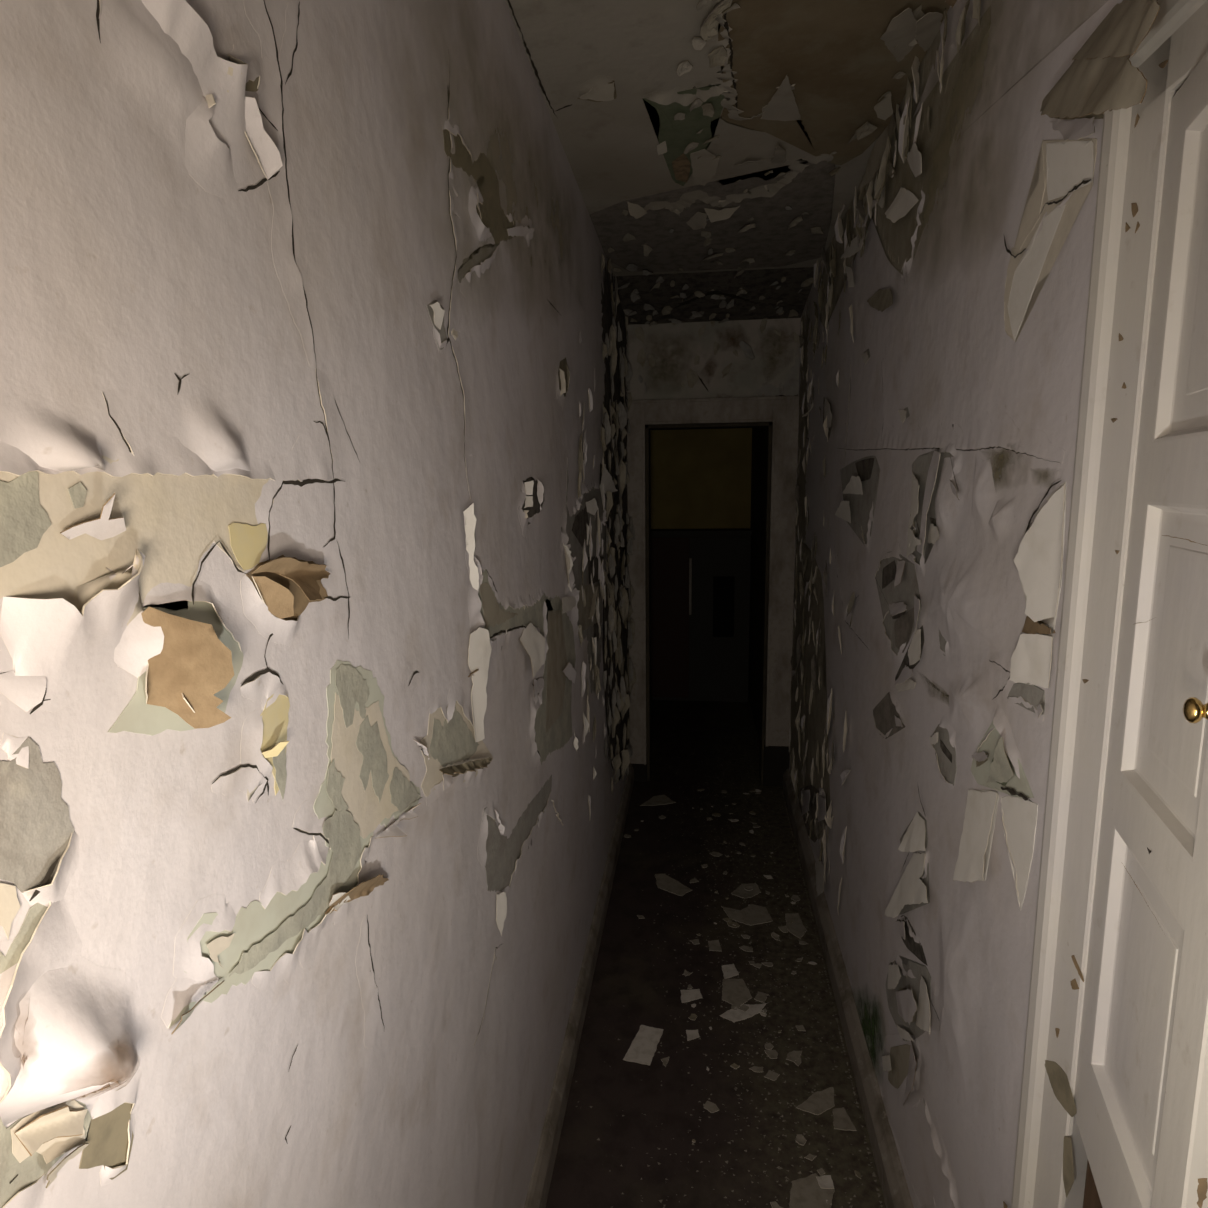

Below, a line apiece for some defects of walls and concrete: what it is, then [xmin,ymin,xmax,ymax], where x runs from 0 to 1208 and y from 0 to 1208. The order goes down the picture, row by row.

crack [95,0,103,43]
peeling [0,432,330,799]
crack [238,0,359,639]
crack [507,0,572,117]
peeling [141,0,991,1035]
peeling [929,480,1066,910]
peeling [1003,0,1161,342]
peeling [0,733,142,1208]
peeling [881,788,959,1208]